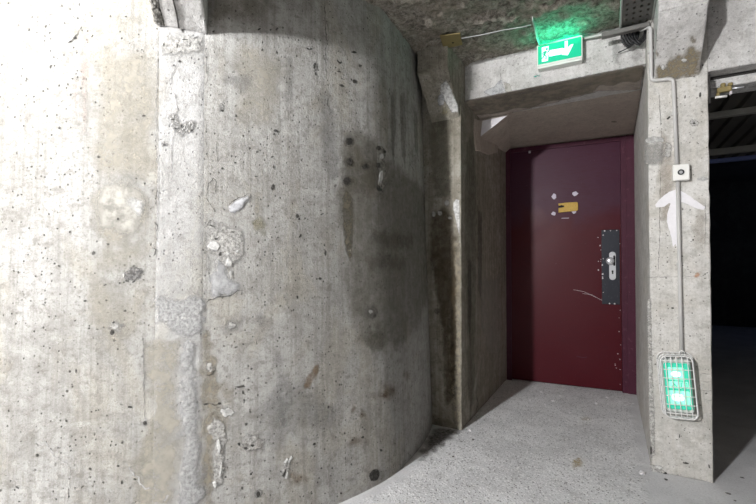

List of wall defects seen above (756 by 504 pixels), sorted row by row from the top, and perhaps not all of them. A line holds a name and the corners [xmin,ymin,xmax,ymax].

spalling [169,114,195,136]
spalling [123,267,143,283]
spalling [202,222,244,267]
damp [343,191,353,258]
damp [431,209,461,424]
spalling [207,408,234,488]